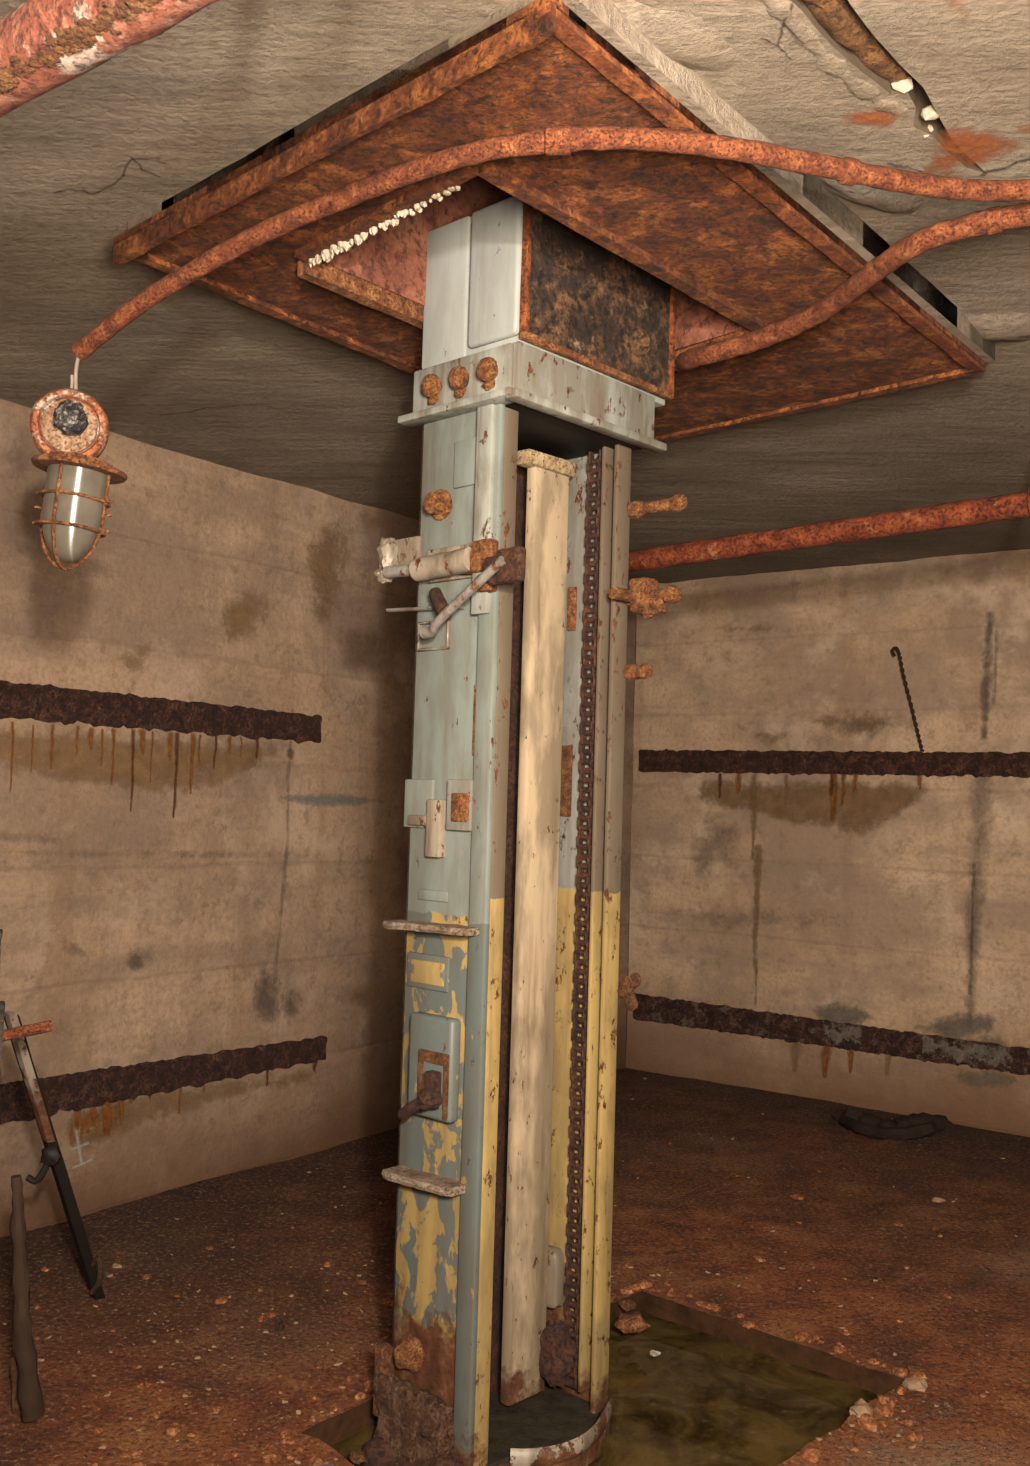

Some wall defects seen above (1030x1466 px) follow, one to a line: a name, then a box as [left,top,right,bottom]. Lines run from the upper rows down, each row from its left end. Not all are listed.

damp [981,614,991,738]
rust [0,722,262,818]
rust [702,773,922,982]
rust [70,1083,245,1142]